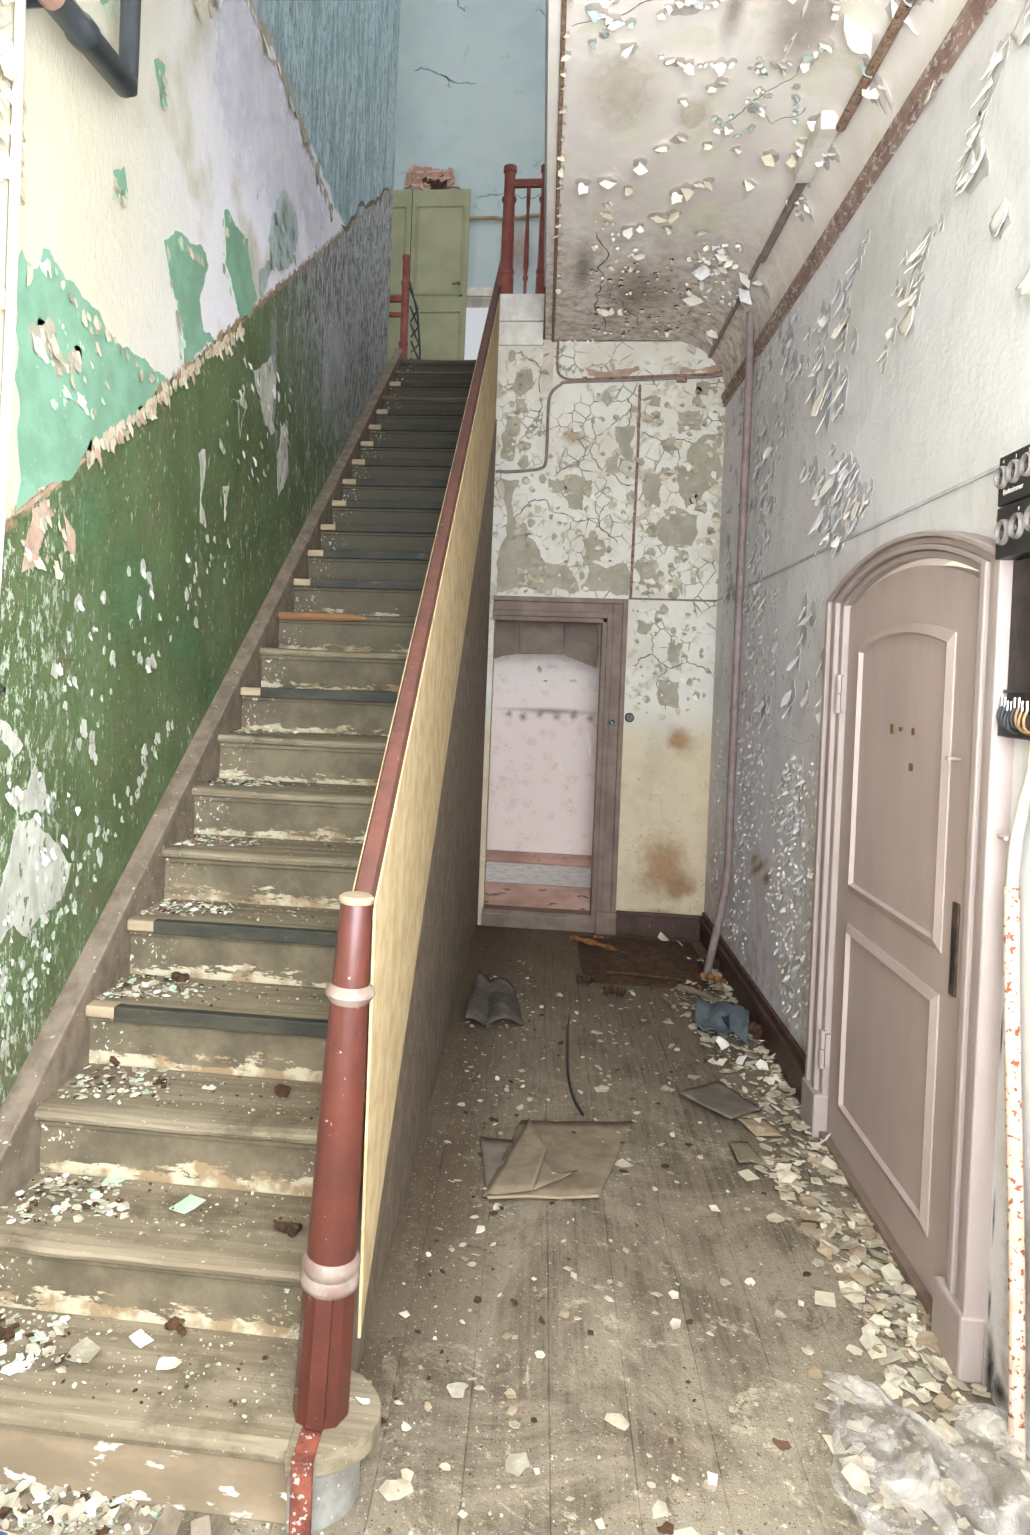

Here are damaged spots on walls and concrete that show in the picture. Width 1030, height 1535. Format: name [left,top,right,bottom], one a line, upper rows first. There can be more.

peeling [0,0,28,205]
peeling [154,58,168,113]
peeling [885,0,934,35]
peeling [953,0,1030,197]
peeling [113,167,129,208]
peeling [877,214,944,374]
peeling [989,198,1011,240]
peeling [15,189,299,673]
crack [501,397,692,551]
peeling [496,0,893,1029]
peeling [51,663,112,711]
peeling [0,719,174,1068]